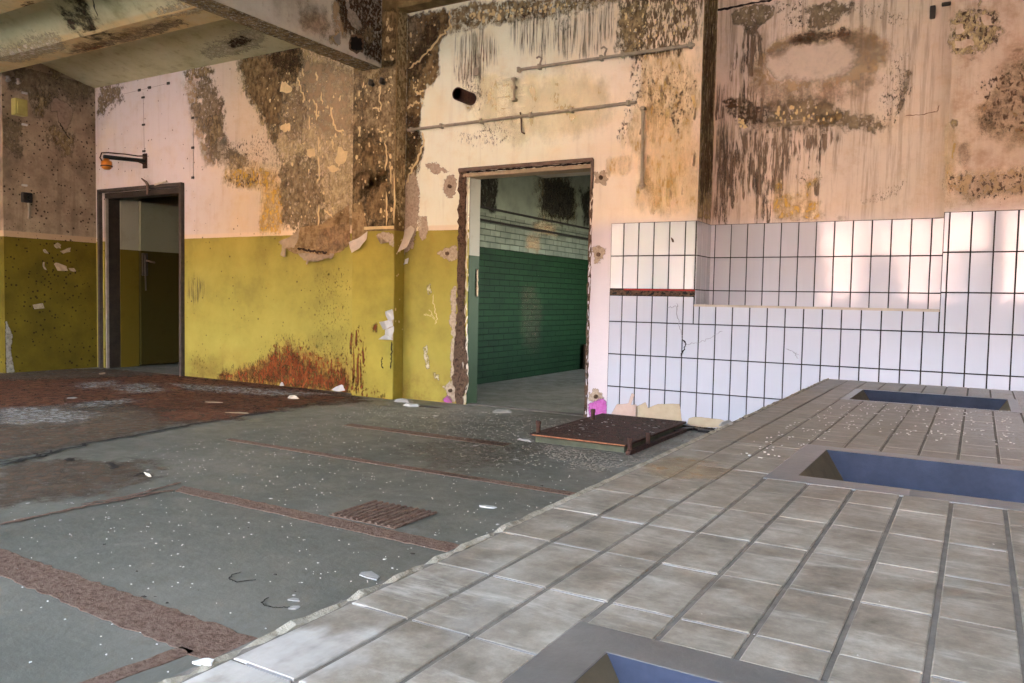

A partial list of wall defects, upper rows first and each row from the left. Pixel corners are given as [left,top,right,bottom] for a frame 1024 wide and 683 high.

water stain [184,0,912,254]
water stain [976,60,1024,141]
peeling [279,162,458,265]
water stain [948,147,1024,201]
peeling [43,243,76,272]
crack [668,304,722,357]
corrosion [0,323,385,459]
spalling [612,393,723,428]